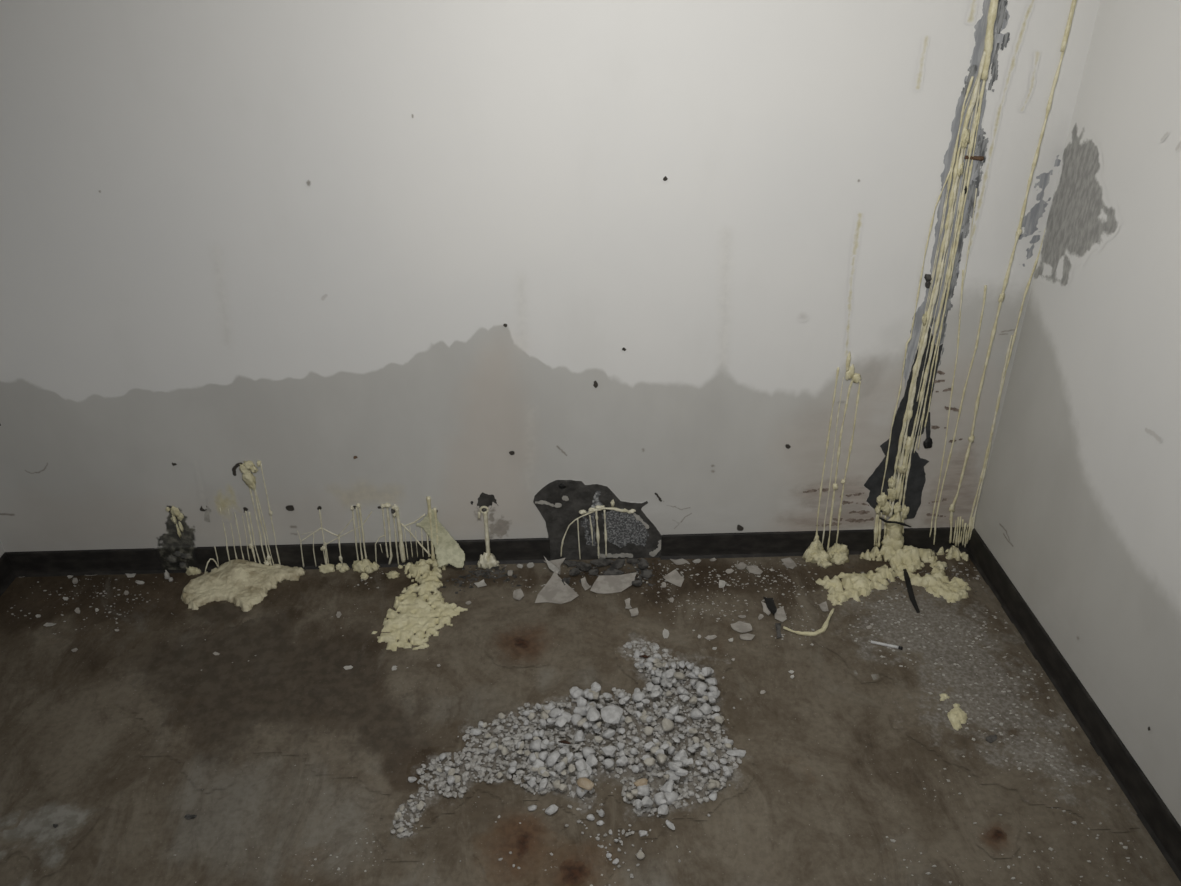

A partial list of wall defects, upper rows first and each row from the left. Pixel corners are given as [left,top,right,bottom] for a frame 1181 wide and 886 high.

damp [0,211,928,582]
flaking render [532,479,688,609]
peeling [863,0,1012,520]
peeling [1017,118,1124,292]